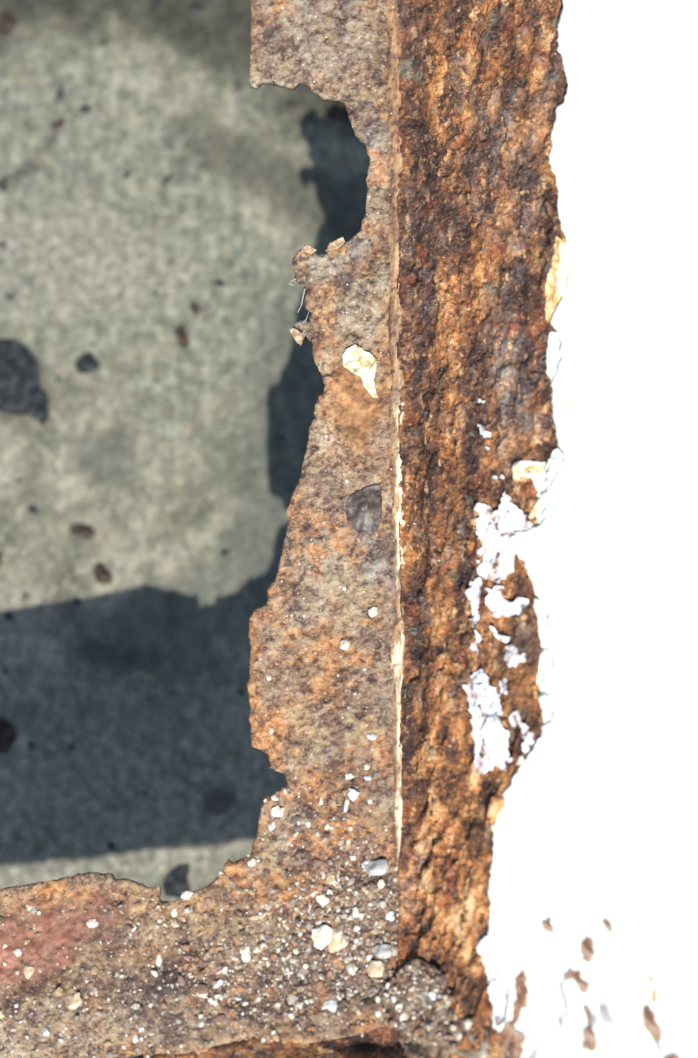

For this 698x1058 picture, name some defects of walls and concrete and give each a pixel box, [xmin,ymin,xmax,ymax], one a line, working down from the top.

peeling [477,424,492,450]
corrosion [318,0,568,1058]
peeling [462,448,565,776]
corrosion [248,623,262,749]
corrosion [263,866,297,887]
corrosion [0,911,110,986]
corrosion [115,1019,408,1058]
corrosion [558,938,596,1029]
corrosion [582,1002,614,1052]
corrosion [642,967,680,1058]